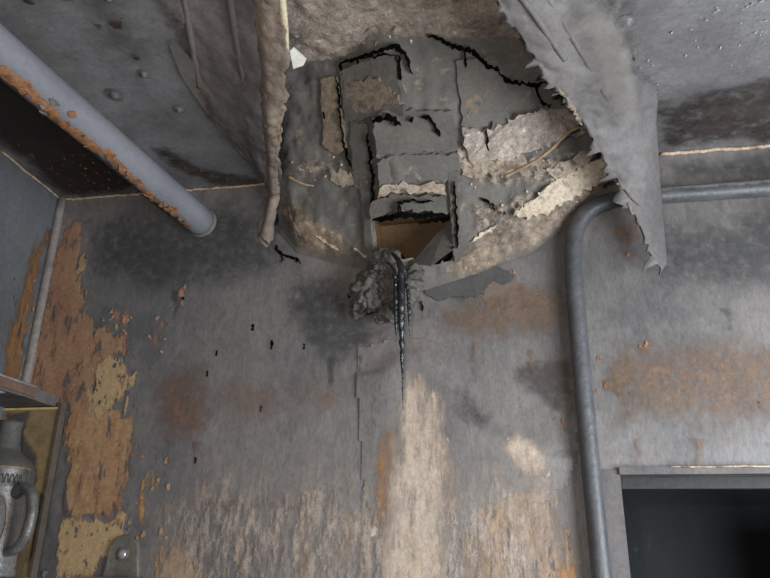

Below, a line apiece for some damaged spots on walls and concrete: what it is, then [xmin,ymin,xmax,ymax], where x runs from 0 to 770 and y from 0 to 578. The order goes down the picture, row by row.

rust [0,66,191,227]
crack [323,44,459,265]
crack [427,34,551,108]
crack [482,198,506,215]
peeling [30,220,170,578]
damp [165,372,582,578]